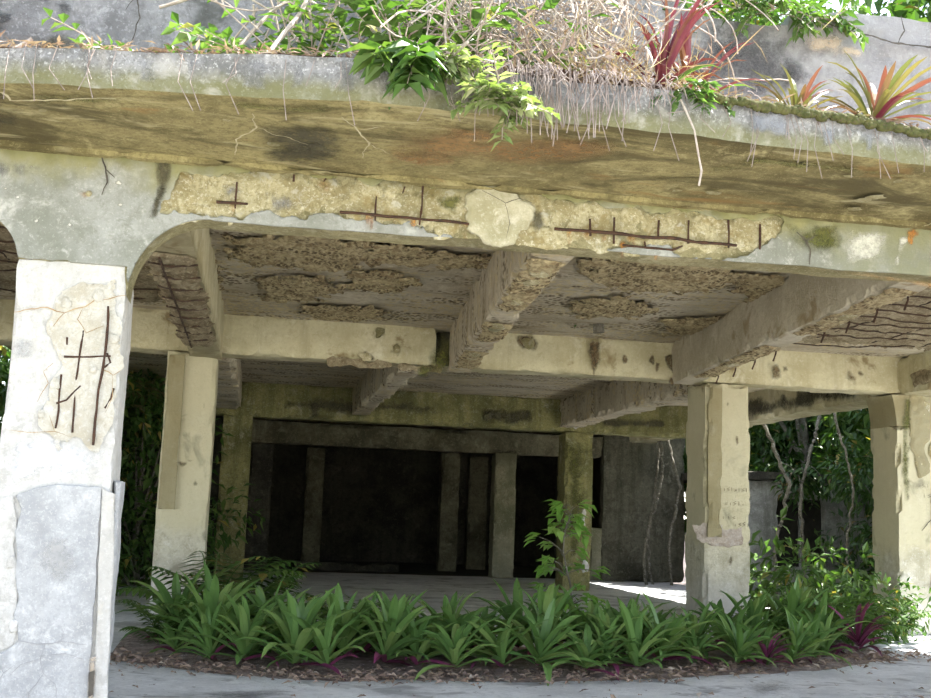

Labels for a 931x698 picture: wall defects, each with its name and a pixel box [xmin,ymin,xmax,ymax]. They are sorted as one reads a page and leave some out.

leakage [269,127,337,161]
leakage [753,115,788,135]
spalling [0,224,19,293]
spalling [160,172,476,323]
spalling [498,194,786,320]
leakage [817,228,834,244]
spalling [133,252,217,348]
spalling [792,287,931,352]
spalling [37,280,124,453]
spalling [694,345,781,390]
spalling [908,369,931,478]
crack [0,627,85,698]